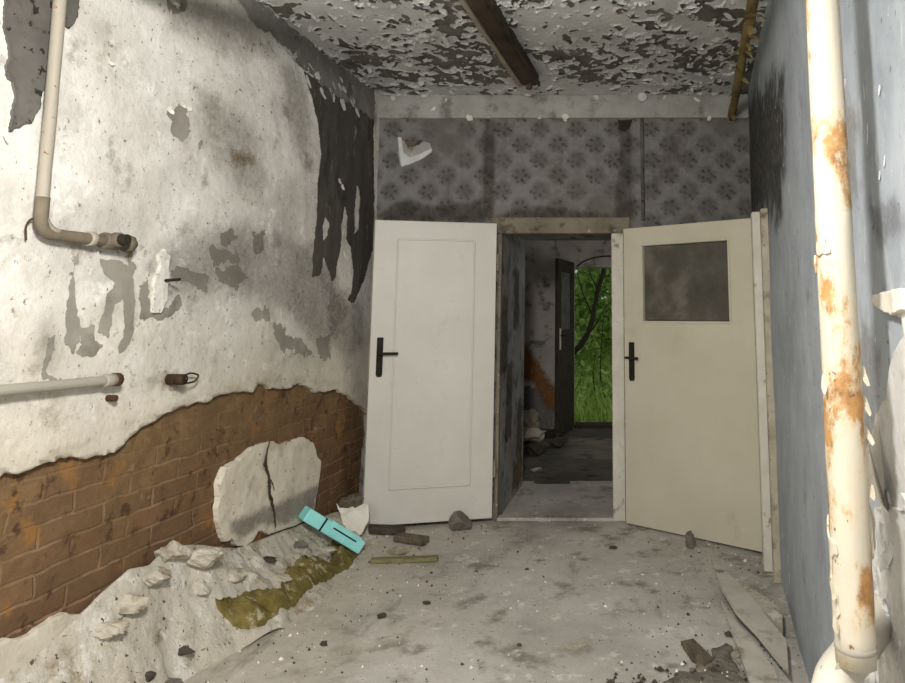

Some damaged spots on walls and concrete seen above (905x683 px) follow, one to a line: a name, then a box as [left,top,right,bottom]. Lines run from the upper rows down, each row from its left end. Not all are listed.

spalling [165,0,187,16]
peeling [255,0,768,117]
spalling [252,230,265,254]
spalling [41,228,248,381]
spalling [251,306,331,361]
flaking render [0,384,364,638]
crack [263,441,276,528]
peeling [861,288,905,683]